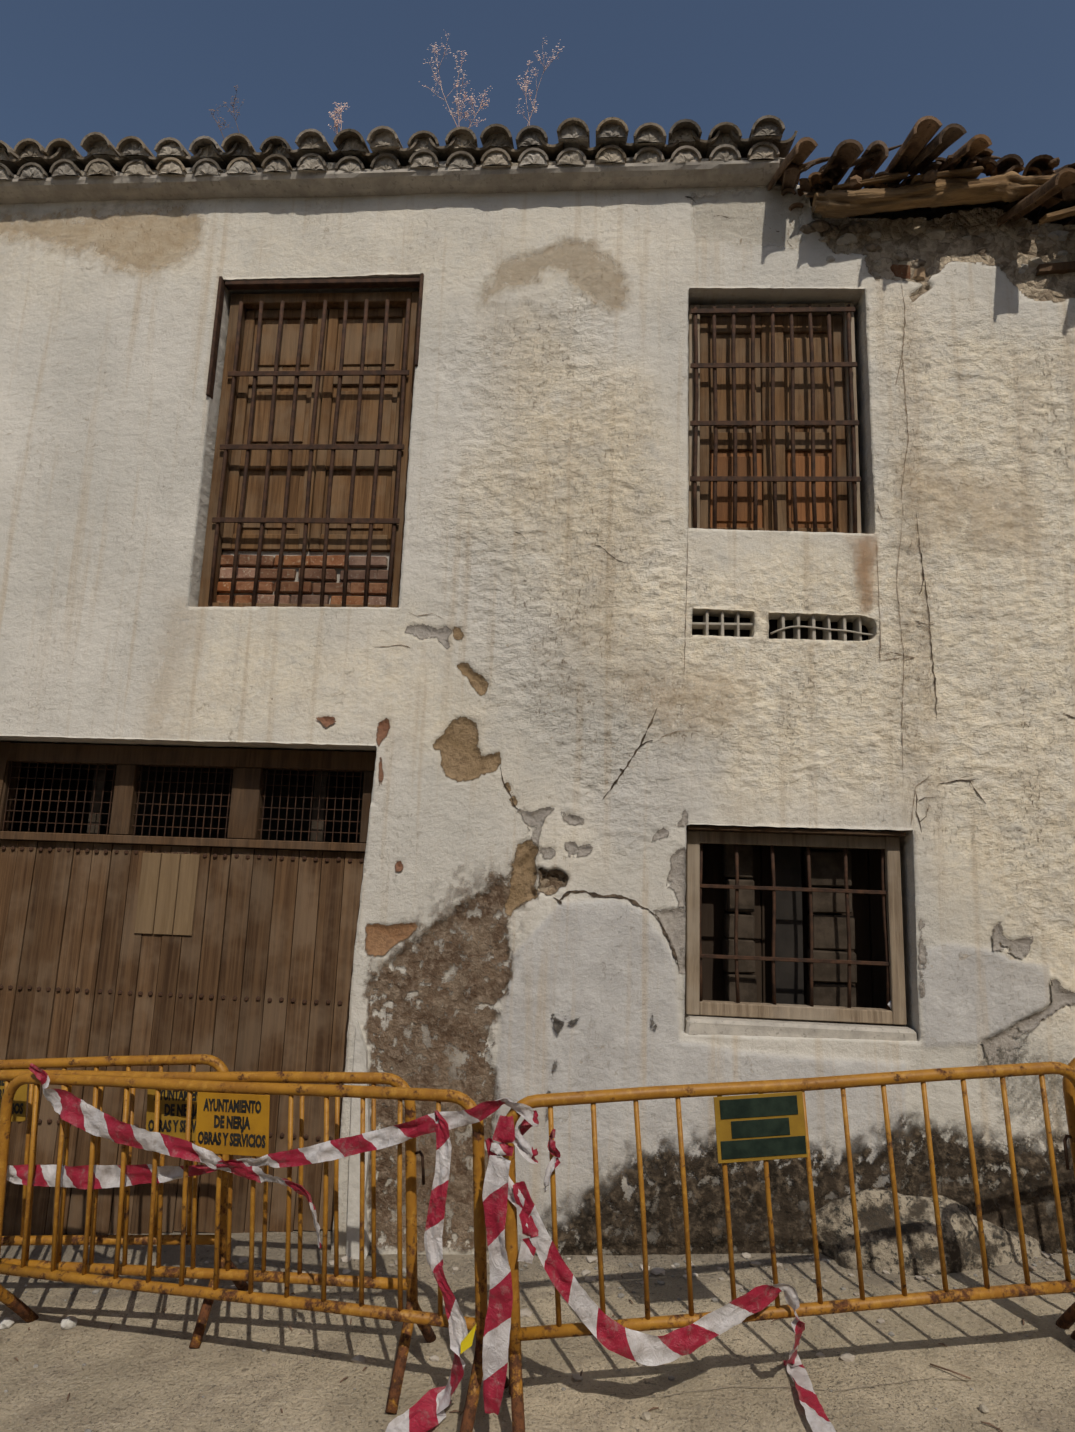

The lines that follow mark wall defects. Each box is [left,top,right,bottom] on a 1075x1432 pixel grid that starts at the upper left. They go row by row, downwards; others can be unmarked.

flaking render [692,187,1075,303]
crack [876,290,986,832]
flaking render [405,624,464,649]
flaking render [457,662,489,696]
crack [603,709,681,799]
crack [553,890,679,968]
flaking render [652,810,688,974]
flaking render [346,716,593,1259]
flaking render [981,979,1075,1065]
leakage [546,1115,1075,1256]